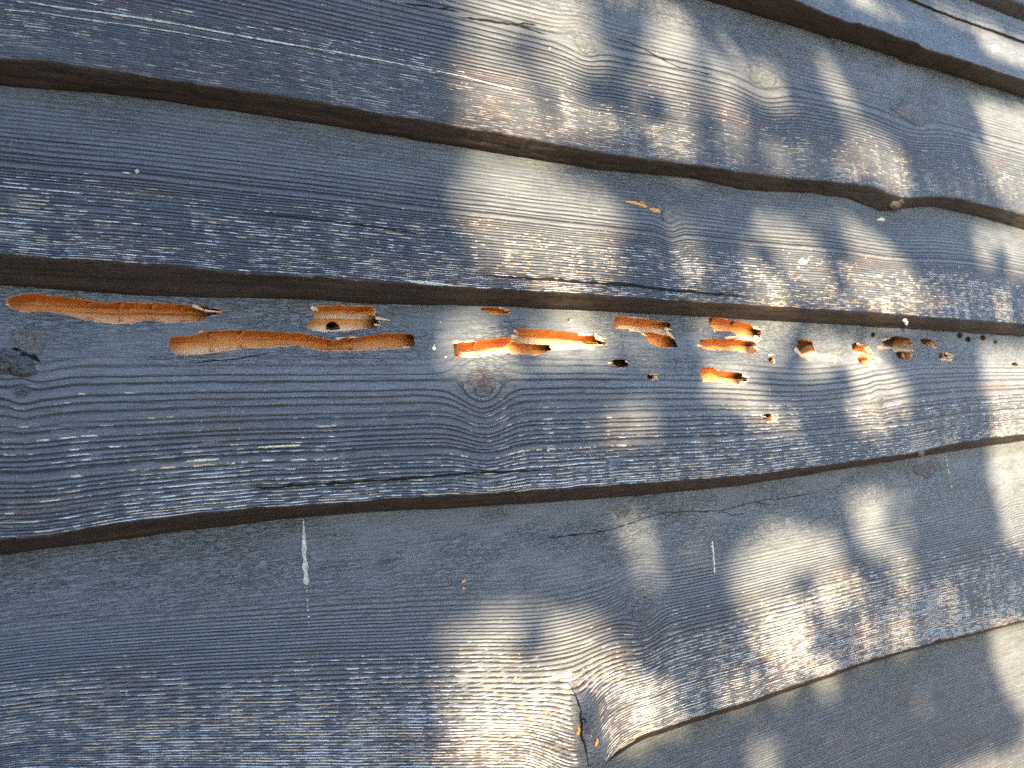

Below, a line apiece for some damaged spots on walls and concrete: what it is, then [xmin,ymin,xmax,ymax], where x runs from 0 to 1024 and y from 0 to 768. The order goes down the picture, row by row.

crack [569,683,589,768]